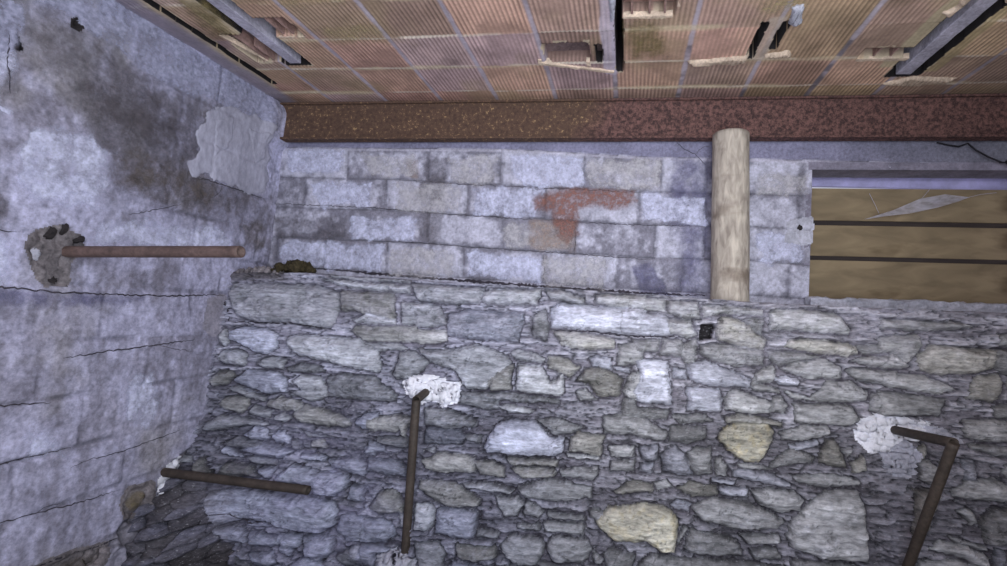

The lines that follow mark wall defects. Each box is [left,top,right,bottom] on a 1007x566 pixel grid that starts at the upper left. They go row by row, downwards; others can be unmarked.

crack [4,33,12,90]
peeling [45,0,278,195]
rust [530,188,634,248]
crack [0,286,333,330]
crack [66,340,193,358]
crack [0,400,49,408]
crack [0,430,179,466]
crack [0,490,118,523]